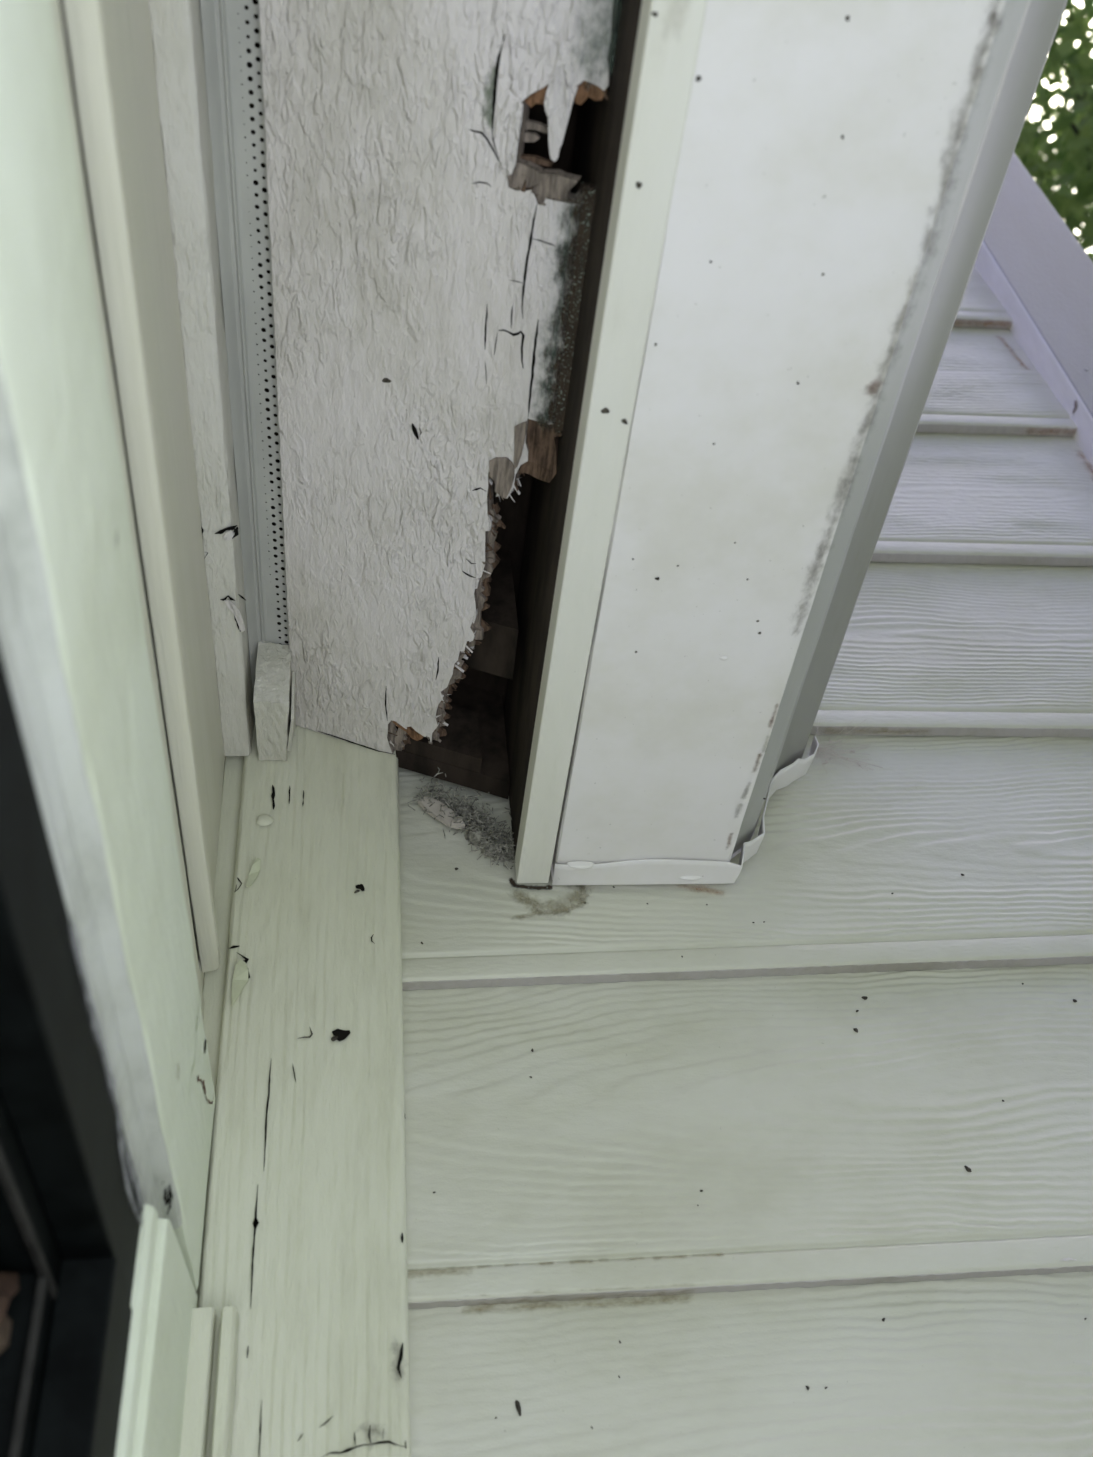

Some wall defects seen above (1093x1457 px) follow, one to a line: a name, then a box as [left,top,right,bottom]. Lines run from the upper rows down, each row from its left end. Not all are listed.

crack [469,34,505,186]
crack [484,205,557,416]
water stain [537,184,596,434]
water stain [509,878,552,890]